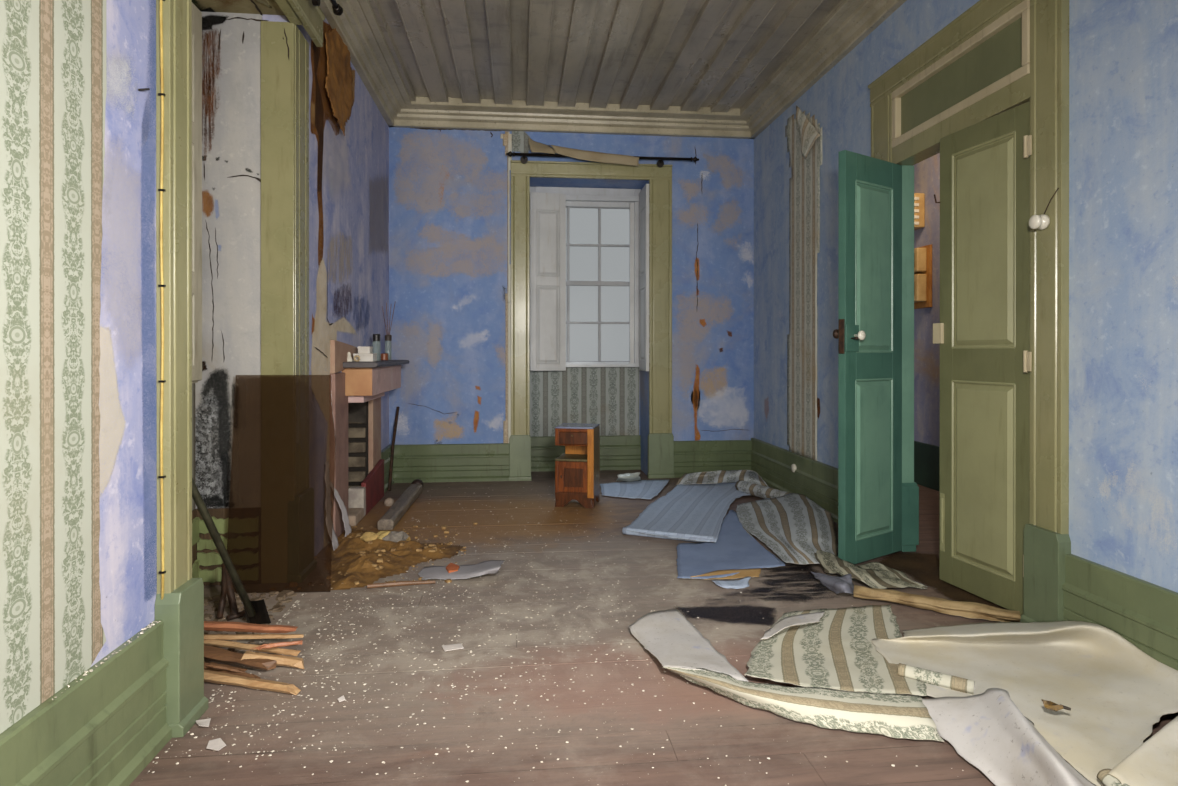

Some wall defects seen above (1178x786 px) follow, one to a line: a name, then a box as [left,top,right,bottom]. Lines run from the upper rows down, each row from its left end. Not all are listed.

corrosion [202,28,222,160]
corrosion [202,189,215,218]
crack [204,165,261,182]
crack [205,220,225,359]
spalling [310,22,357,547]
peeling [675,289,735,344]
leakage [195,366,241,508]
corrosion [473,386,481,432]
corrosion [692,364,701,441]
peeling [698,365,750,431]